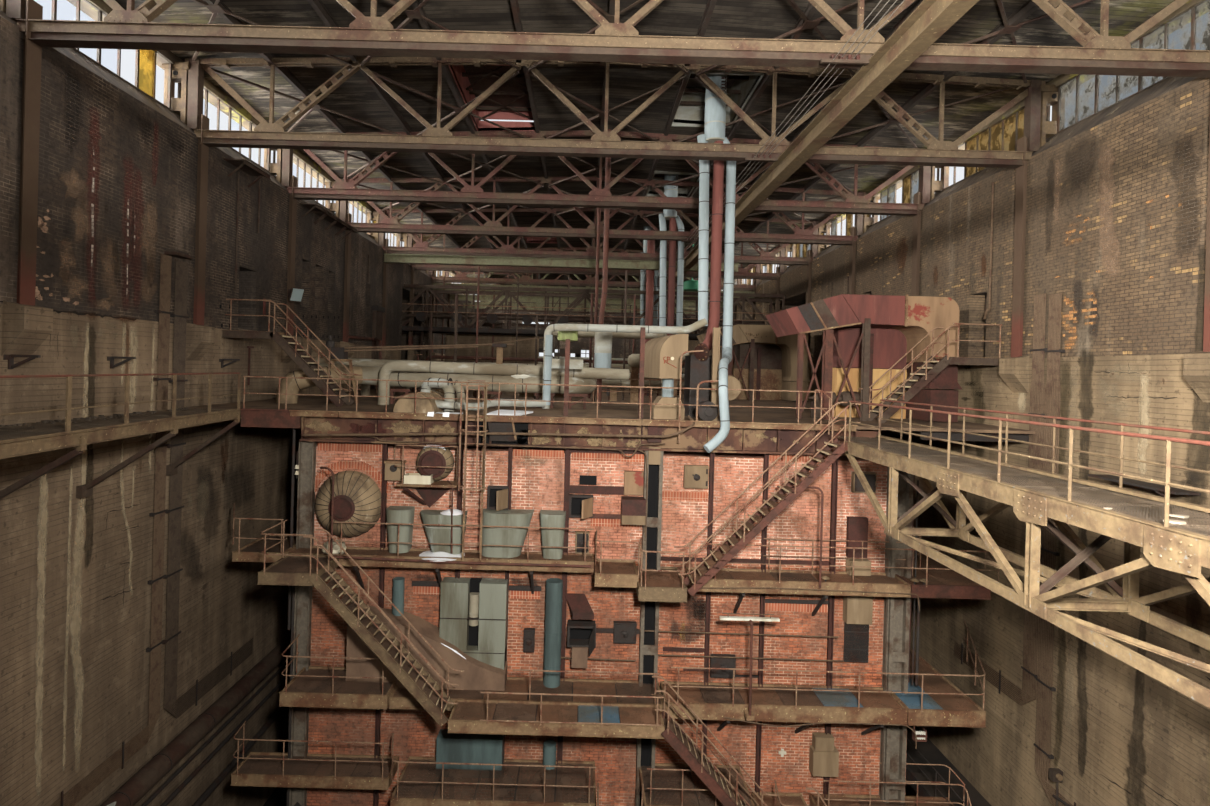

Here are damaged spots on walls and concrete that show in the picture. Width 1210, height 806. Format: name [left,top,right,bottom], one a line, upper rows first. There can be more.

flaking render [35,170,89,305]
damp [1174,142,1206,352]
damp [83,328,96,418]
damp [1058,351,1094,480]
damp [1188,391,1210,505]
damp [35,476,47,776]
damp [63,444,94,765]
damp [1055,631,1088,775]
damp [1078,528,1087,547]
damp [1126,670,1146,806]
damp [1138,620,1146,656]
damp [1187,593,1201,651]